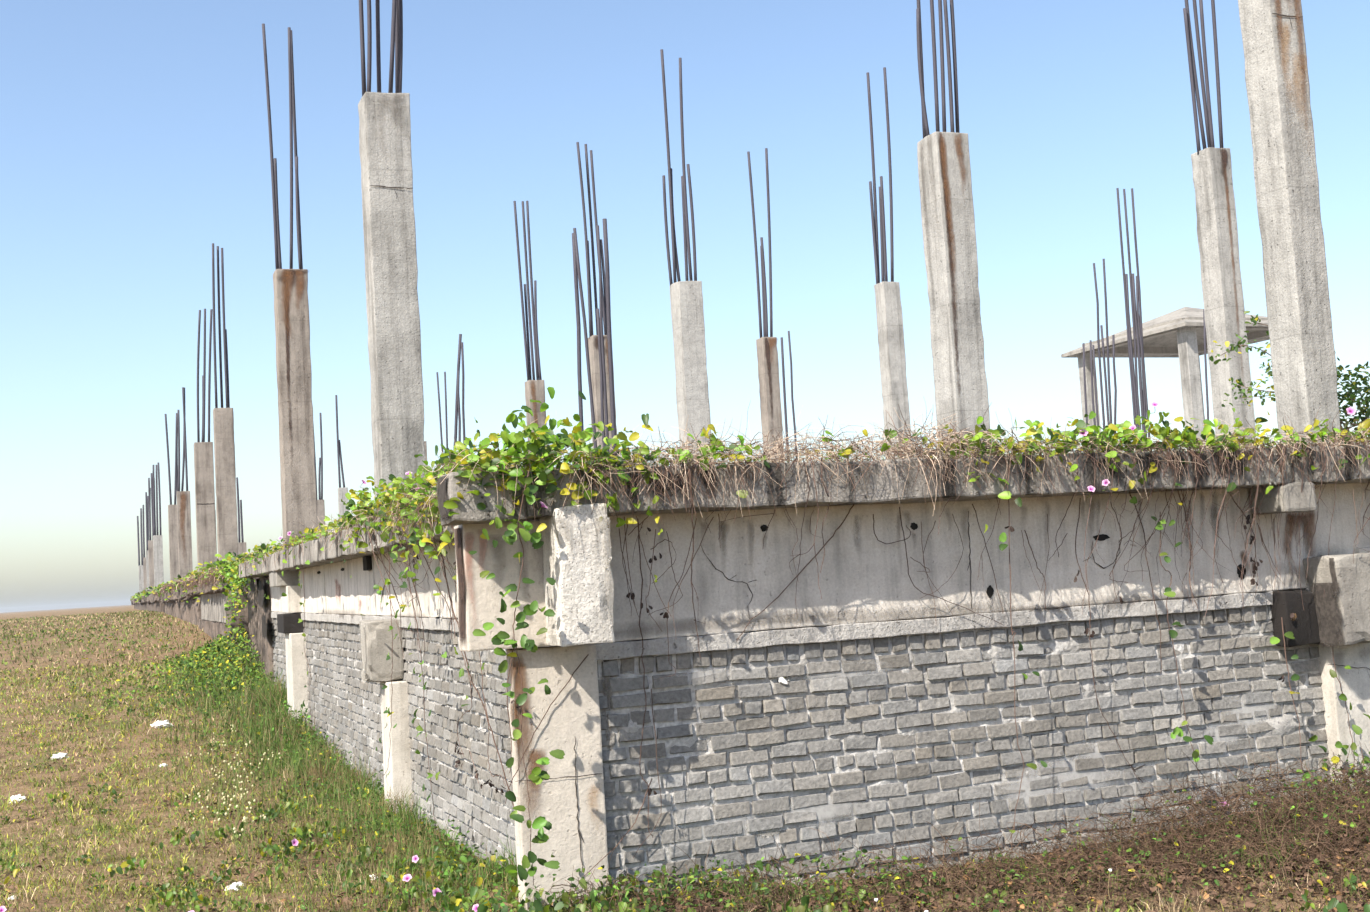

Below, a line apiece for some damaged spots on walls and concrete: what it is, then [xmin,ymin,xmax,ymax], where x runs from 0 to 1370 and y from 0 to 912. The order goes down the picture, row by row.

rust [1276,0,1303,68]
rust [939,133,964,385]
rust [454,527,485,641]
rust [511,659,543,791]